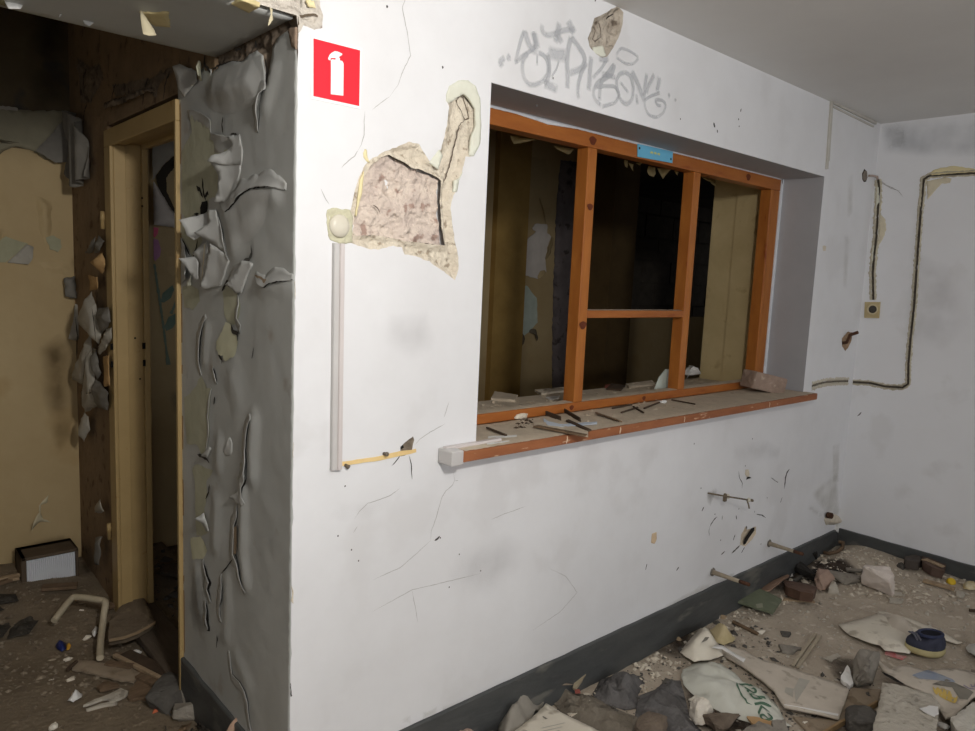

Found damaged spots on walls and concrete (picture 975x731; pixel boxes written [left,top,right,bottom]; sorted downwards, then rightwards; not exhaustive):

peeling [0,0,23,9]
peeling [139,10,171,36]
spalling [172,0,323,97]
crack [342,1,411,167]
spalling [588,7,623,58]
peeling [0,106,90,187]
spalling [326,80,481,280]
peeling [179,109,266,364]
peeling [64,235,112,441]